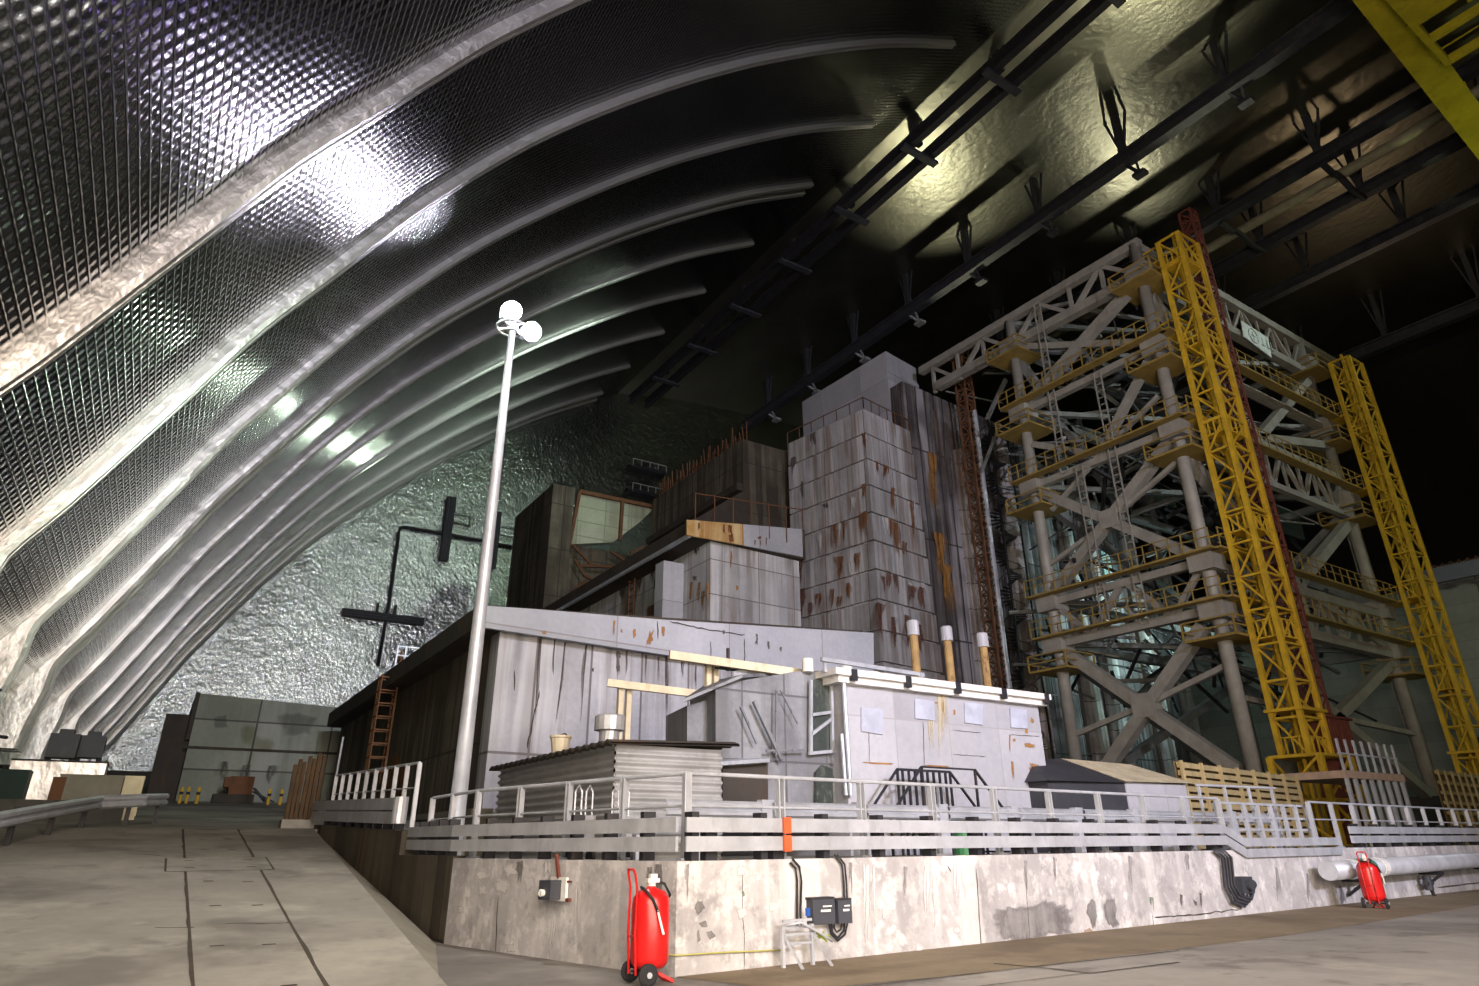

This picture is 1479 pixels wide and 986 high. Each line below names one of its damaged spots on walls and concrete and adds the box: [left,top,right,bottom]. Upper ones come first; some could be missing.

rust [876,461,915,553]
rust [799,483,867,612]
rust [934,532,953,597]
rust [613,620,665,646]
rust [876,570,925,650]